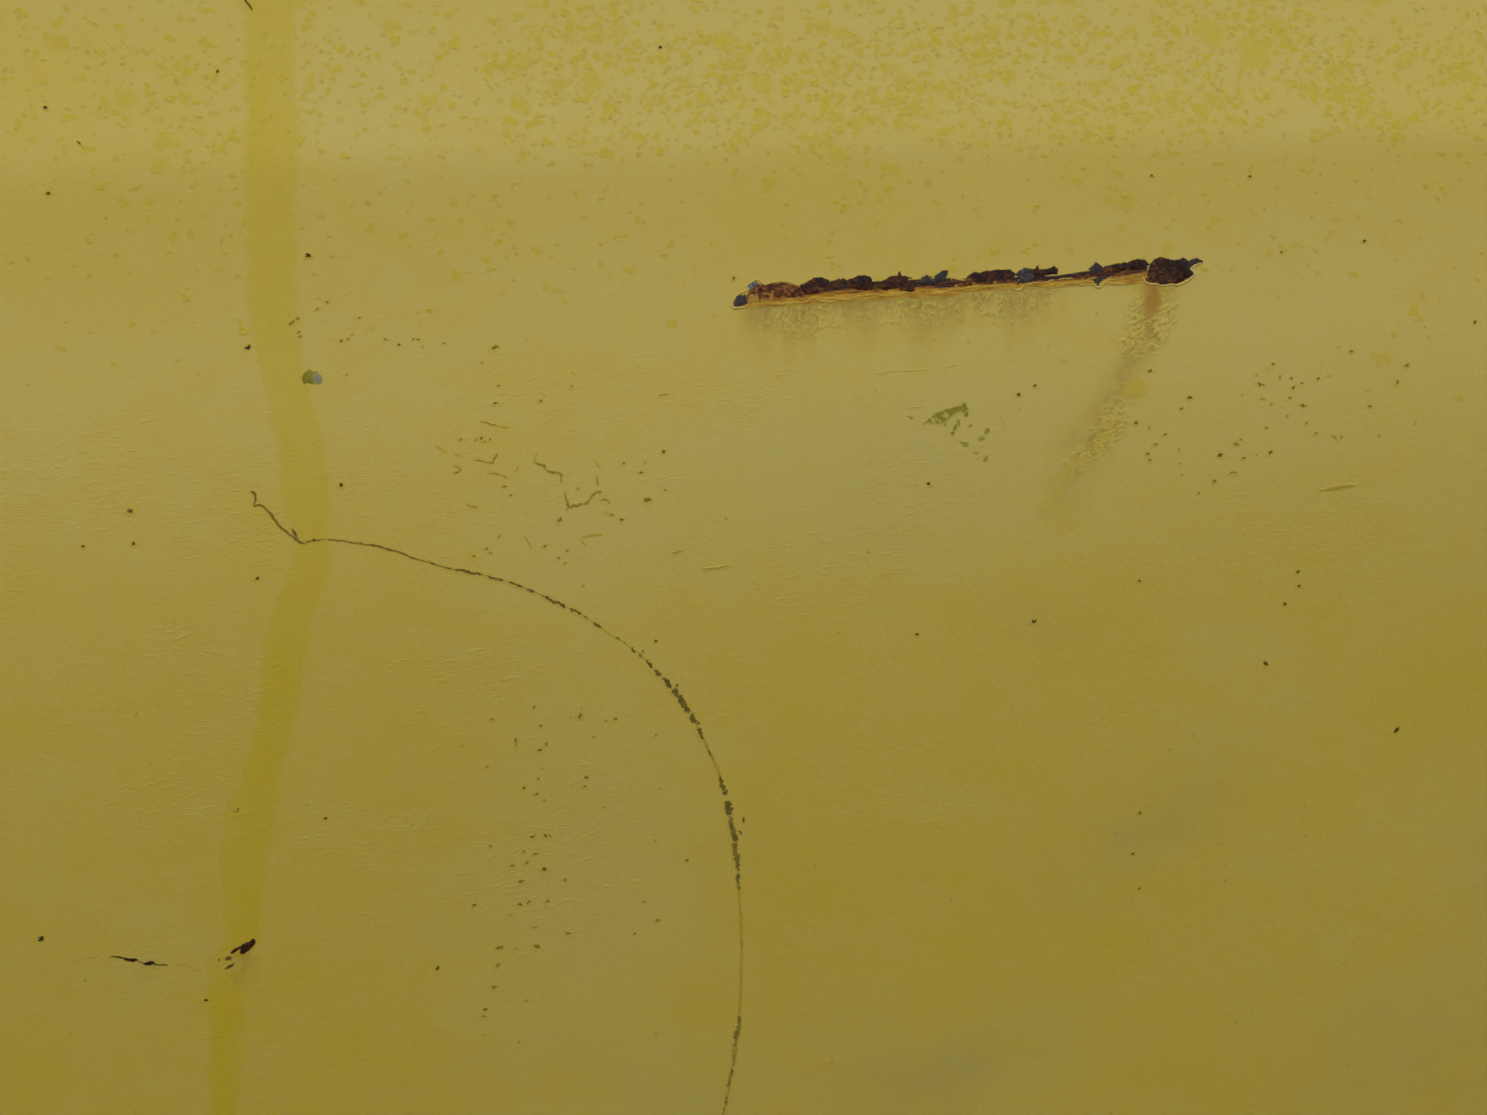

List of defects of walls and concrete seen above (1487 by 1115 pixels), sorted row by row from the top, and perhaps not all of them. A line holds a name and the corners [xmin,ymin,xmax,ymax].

corrosion [747,271,916,304]
crack [435,420,611,547]
crack [249,489,746,1115]